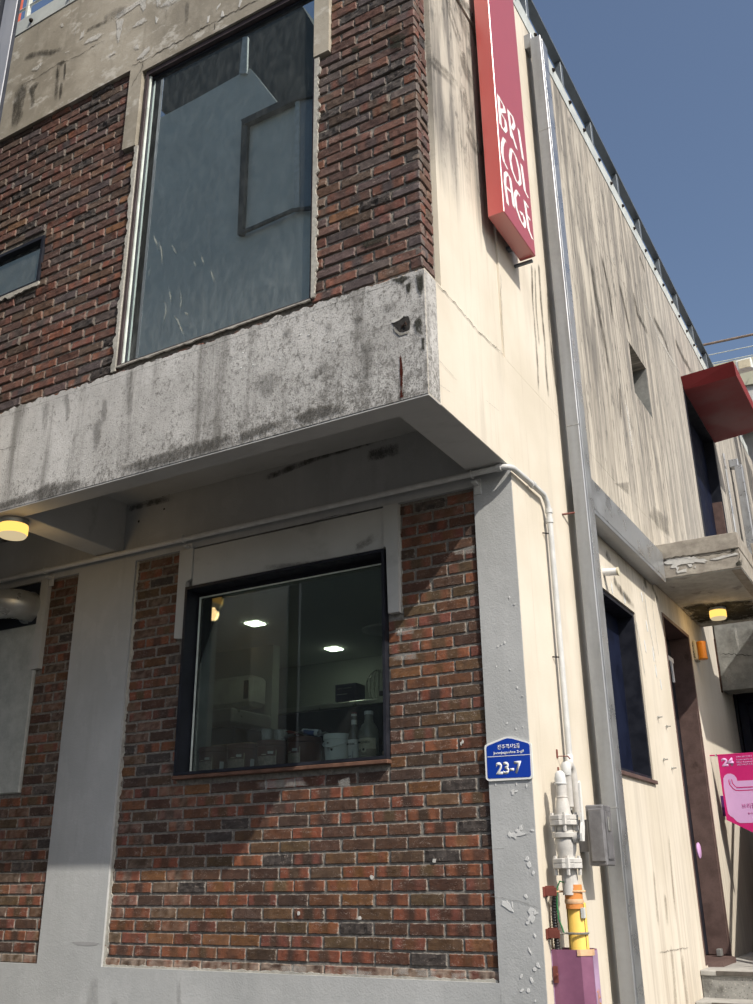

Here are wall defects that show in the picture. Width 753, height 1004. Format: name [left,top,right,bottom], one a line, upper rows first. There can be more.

crack [132,0,257,85]
spalling [391,315,410,336]
leakage [296,405,348,422]
leakage [127,422,279,470]
leakage [0,481,80,509]
peeling [664,548,742,573]